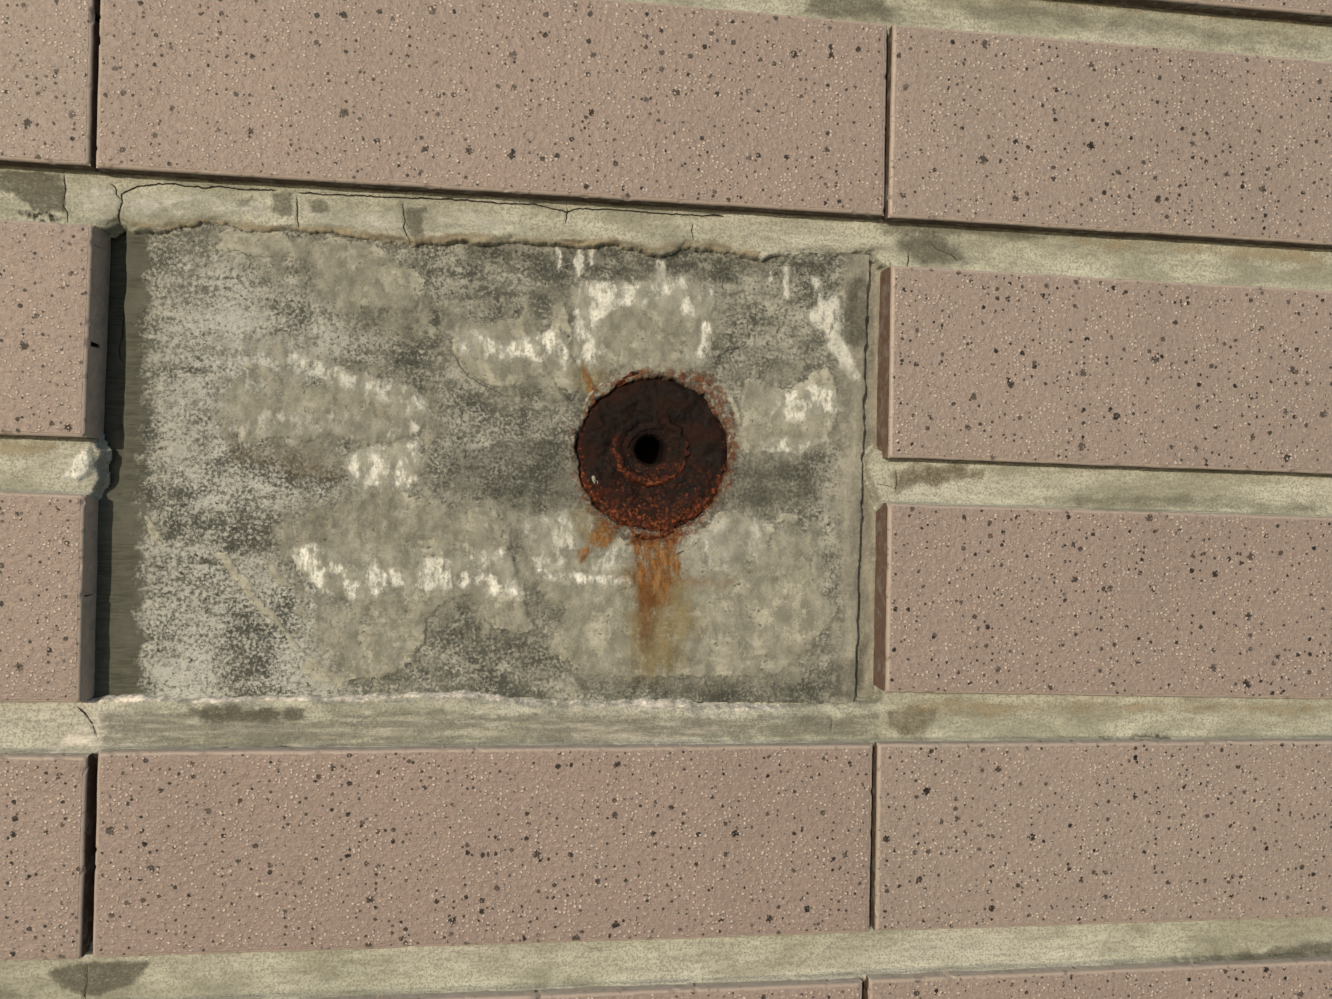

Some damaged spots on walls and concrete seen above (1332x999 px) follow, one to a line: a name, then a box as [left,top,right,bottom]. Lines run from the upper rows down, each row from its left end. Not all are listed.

peeling [216,228,438,347]
peeling [451,277,717,410]
peeling [727,311,857,453]
peeling [144,515,163,541]
peeling [210,352,840,688]
corrosion [574,369,737,672]